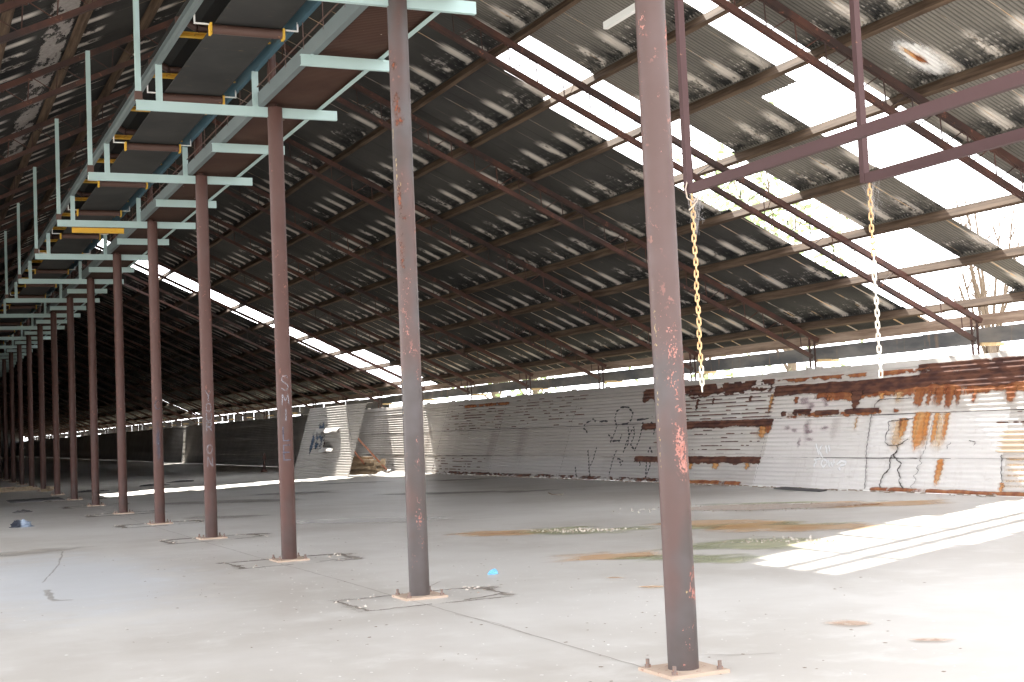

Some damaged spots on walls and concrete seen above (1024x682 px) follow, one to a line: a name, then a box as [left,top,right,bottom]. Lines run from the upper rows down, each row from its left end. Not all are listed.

rust [642,389,655,403]
rust [685,356,1024,485]
rust [817,459,1024,507]